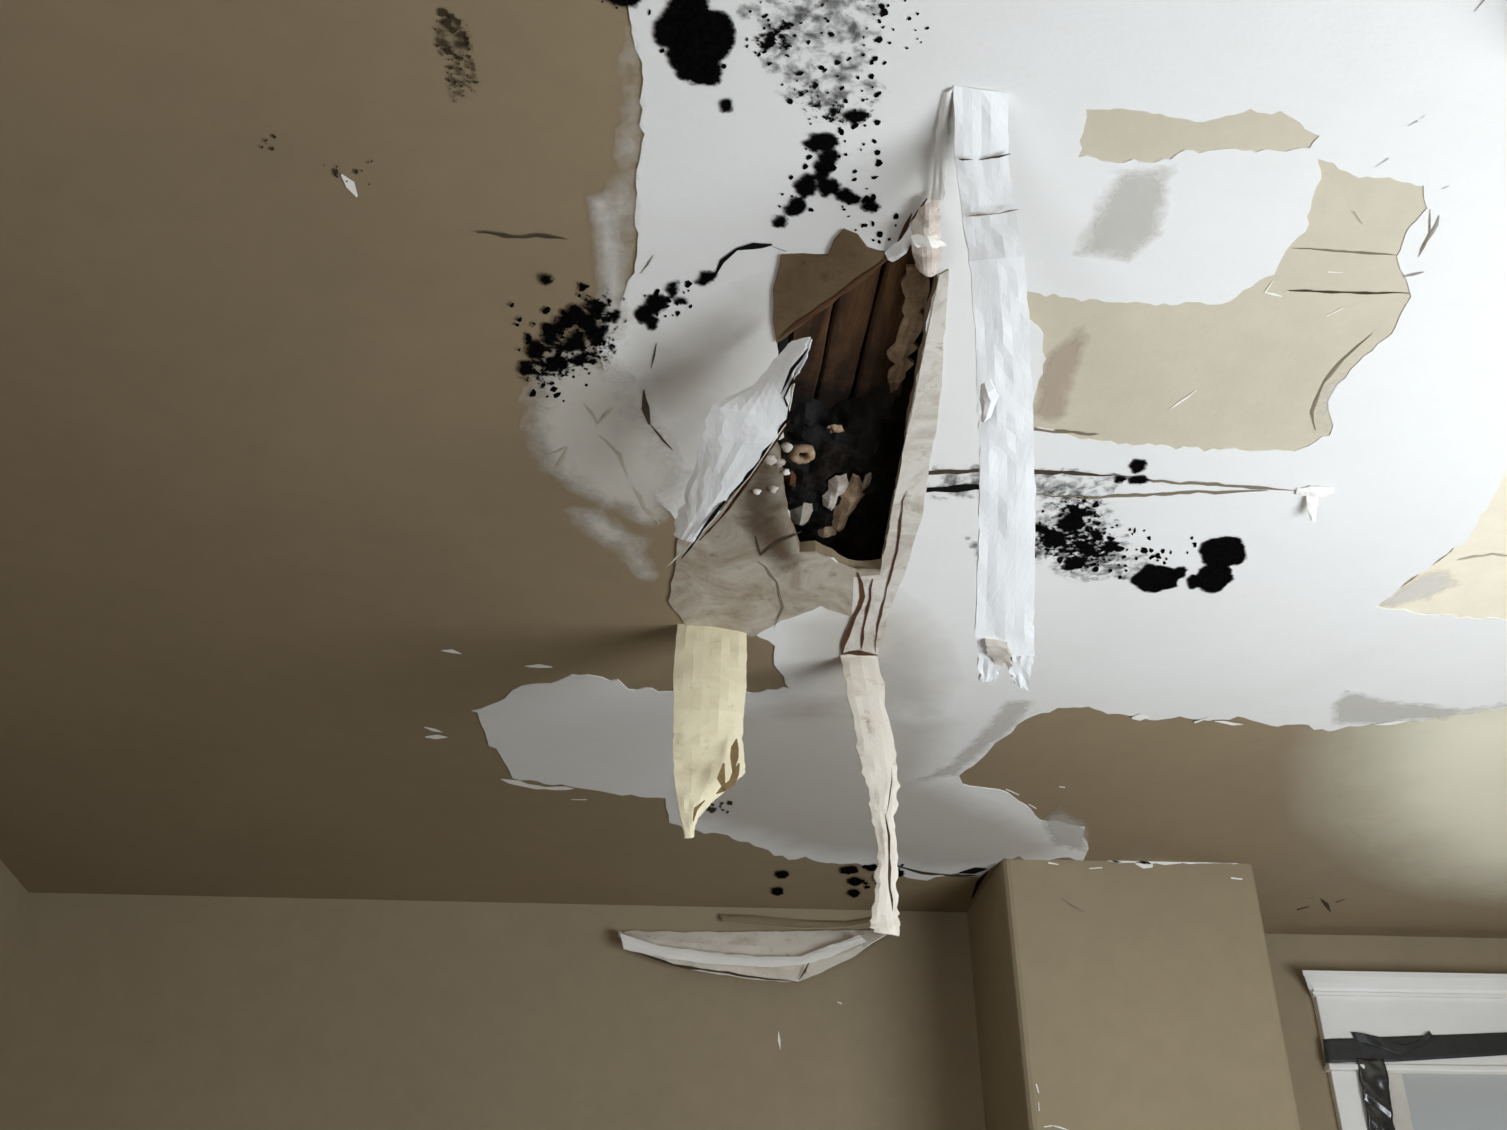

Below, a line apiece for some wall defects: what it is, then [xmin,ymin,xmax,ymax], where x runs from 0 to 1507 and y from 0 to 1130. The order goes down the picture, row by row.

damp [601,0,929,244]
damp [509,271,718,402]
peeling [1027,108,1427,451]
peeling [668,433,880,637]
damp [1115,459,1149,484]
damp [1035,496,1247,594]
peeling [1377,470,1507,619]